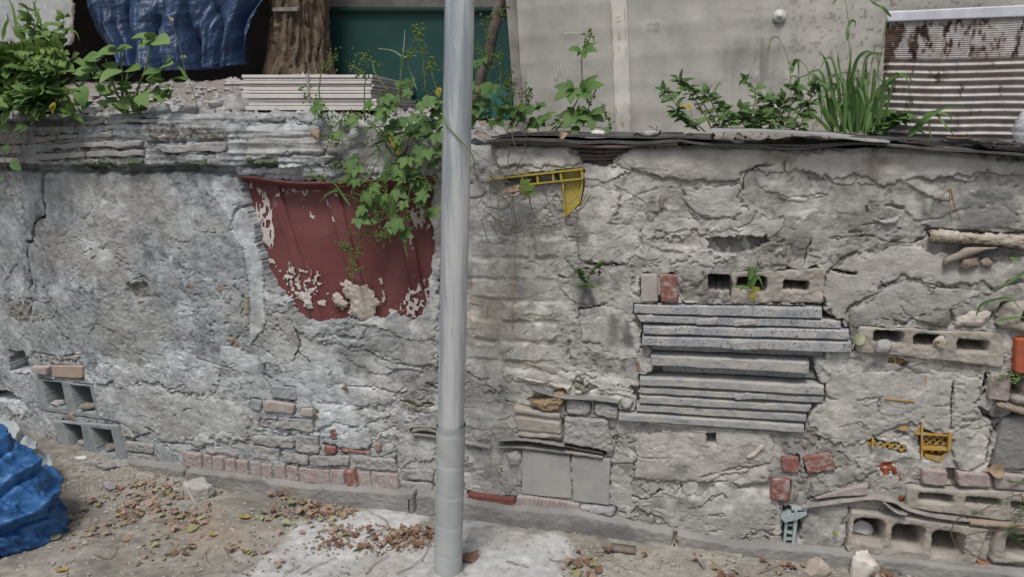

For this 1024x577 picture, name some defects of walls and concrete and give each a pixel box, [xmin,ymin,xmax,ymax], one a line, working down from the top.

peeling [268,258,386,321]